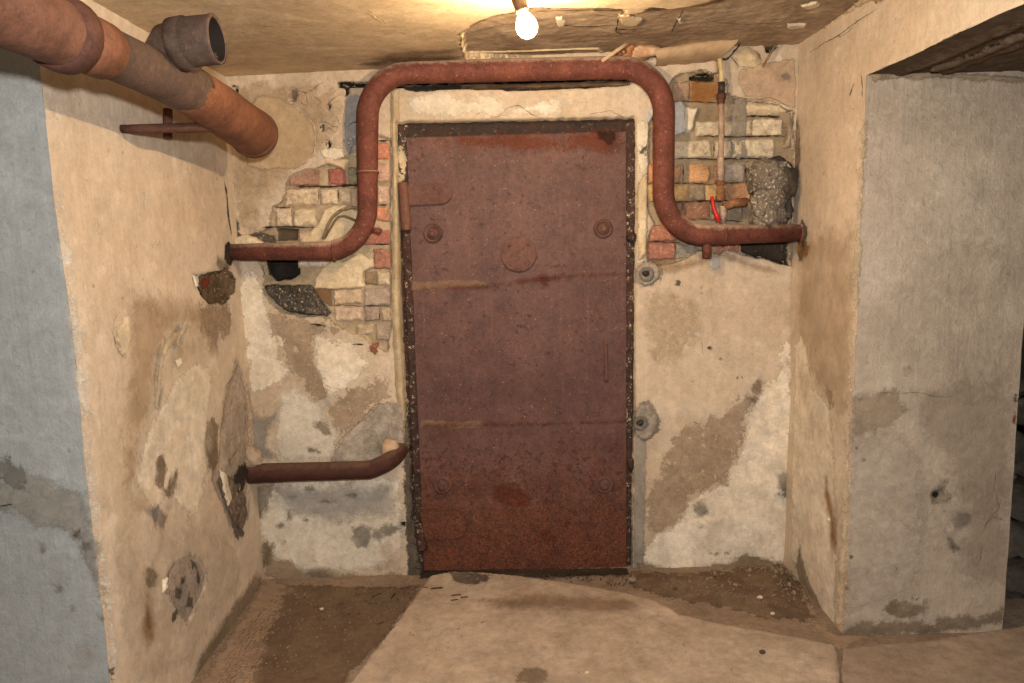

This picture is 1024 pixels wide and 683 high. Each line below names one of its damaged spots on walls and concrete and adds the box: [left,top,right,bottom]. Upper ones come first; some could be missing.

flaking render [460,33,604,60]
peeling [618,13,643,27]
flaking render [635,108,807,266]
flaking render [669,69,800,224]
flaking render [135,124,407,572]
damp [0,456,101,585]
flaking render [162,553,209,626]
damp [631,379,761,569]
damp [712,554,779,566]
damp [852,389,903,438]